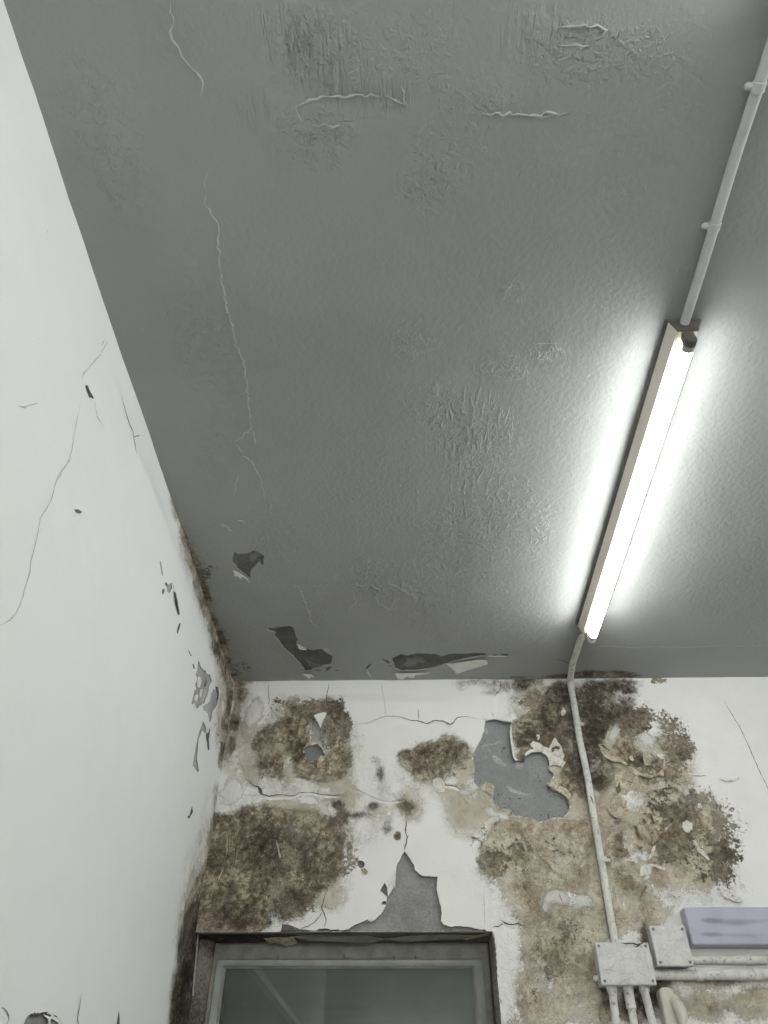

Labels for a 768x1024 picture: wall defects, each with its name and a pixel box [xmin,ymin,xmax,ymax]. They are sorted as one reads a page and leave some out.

crack [1,340,140,625]
peeling [232,535,265,583]
spalling [188,650,223,771]
peeling [267,626,338,679]
crack [240,764,408,847]
crack [363,664,501,747]
peeling [383,653,509,680]
leakage [169,499,768,1024]
flaking render [459,716,572,822]
flaking render [264,843,479,946]